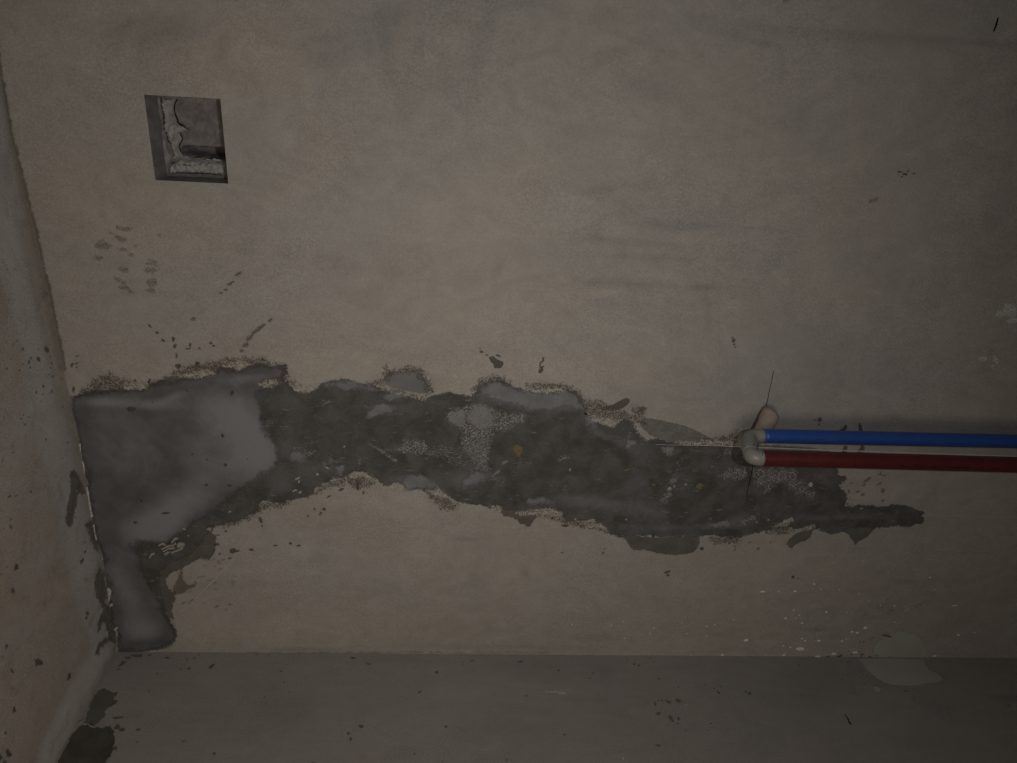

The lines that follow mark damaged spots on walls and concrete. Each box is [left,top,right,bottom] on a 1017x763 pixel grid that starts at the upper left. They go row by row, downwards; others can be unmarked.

leakage [66,324,285,654]
spalling [72,357,924,652]